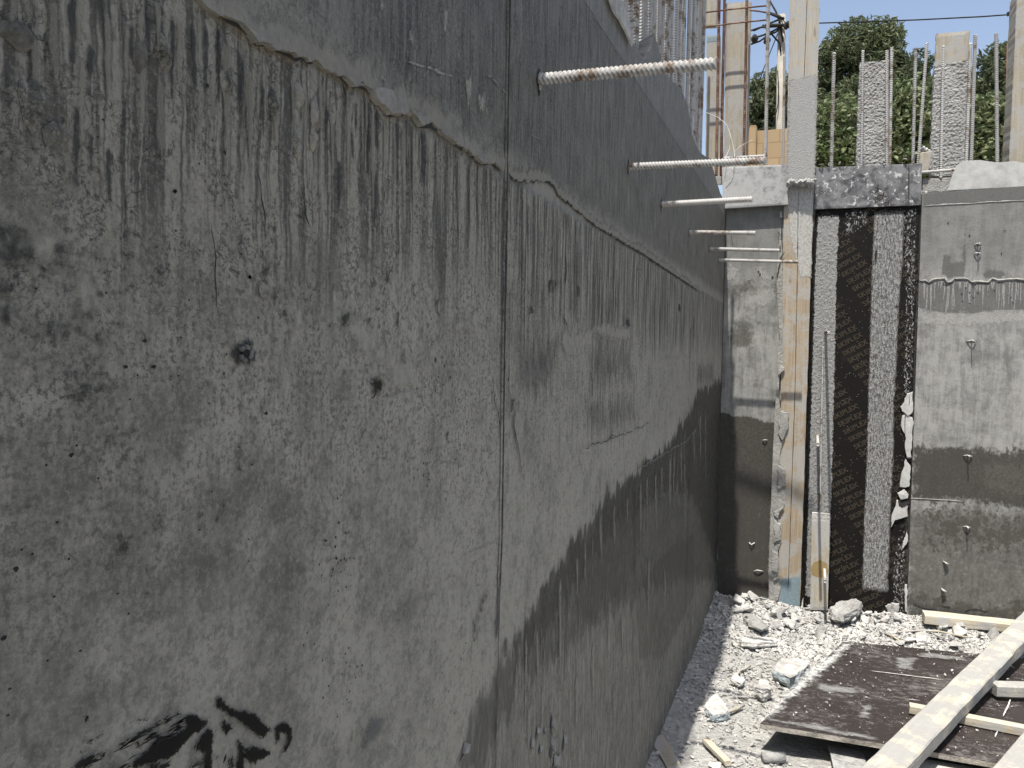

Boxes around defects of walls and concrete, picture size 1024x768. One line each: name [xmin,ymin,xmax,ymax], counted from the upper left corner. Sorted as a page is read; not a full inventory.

water stain [0,218,66,273]
crack [211,226,220,309]
crack [256,169,266,232]
water stain [32,0,499,238]
water stain [511,195,698,397]
water stain [918,248,1024,327]
water stain [466,364,774,768]
water stain [907,445,1024,619]